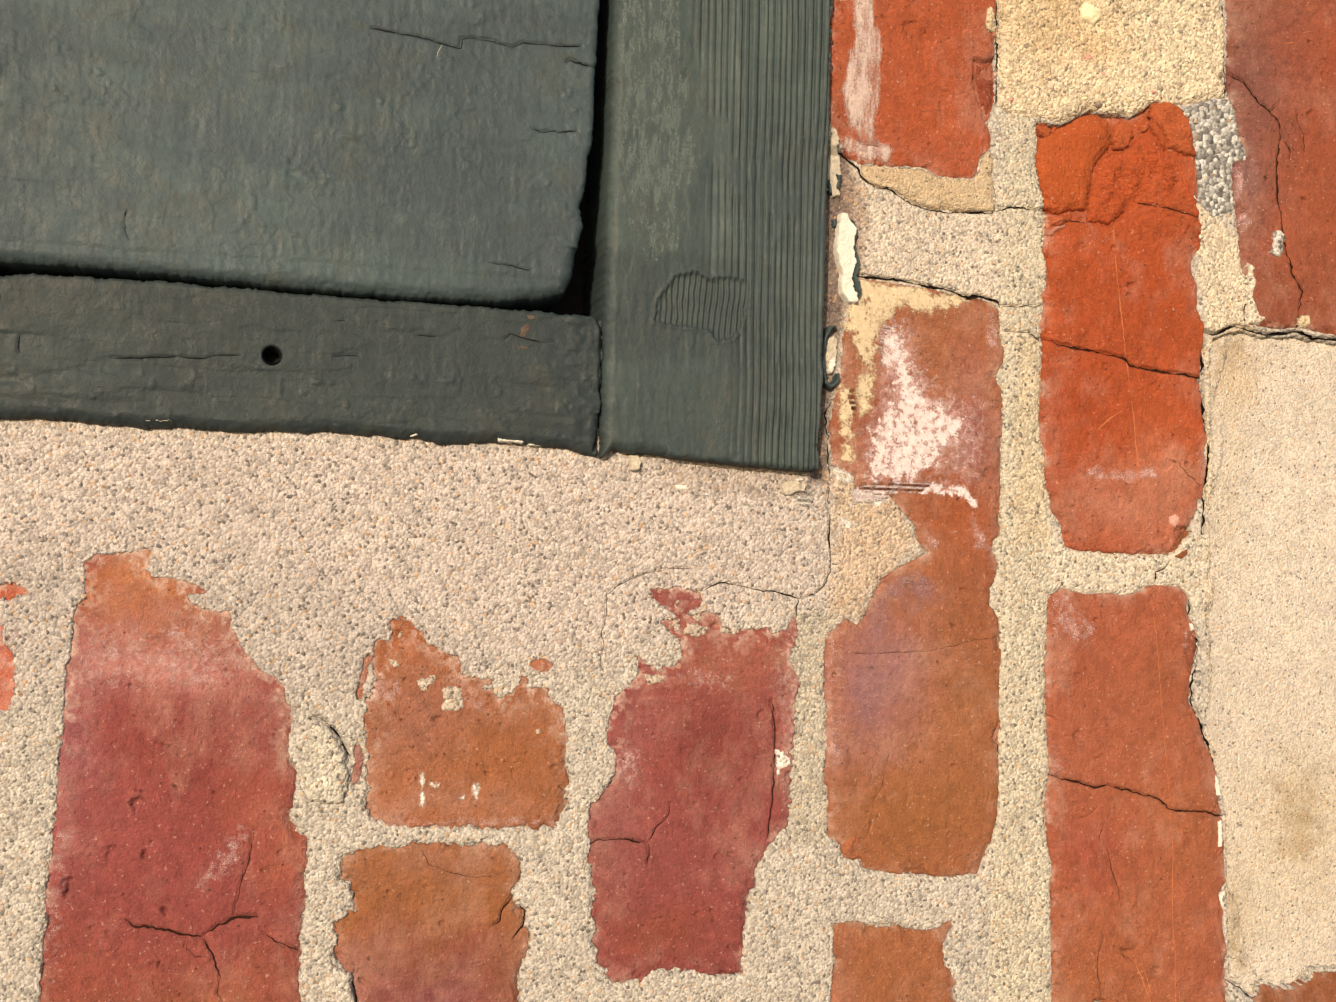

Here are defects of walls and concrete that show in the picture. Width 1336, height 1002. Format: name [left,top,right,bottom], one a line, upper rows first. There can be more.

crack [372,28,594,68]
peeling [612,0,700,260]
peeling [827,174,842,196]
spalling [1035,102,1196,237]
peeling [830,218,862,299]
crack [838,2,1336,535]
peeling [825,336,838,375]
leakage [851,321,978,508]
crack [600,403,832,672]
spalling [1169,530,1192,559]
crack [1047,774,1223,897]
crack [126,831,300,1001]